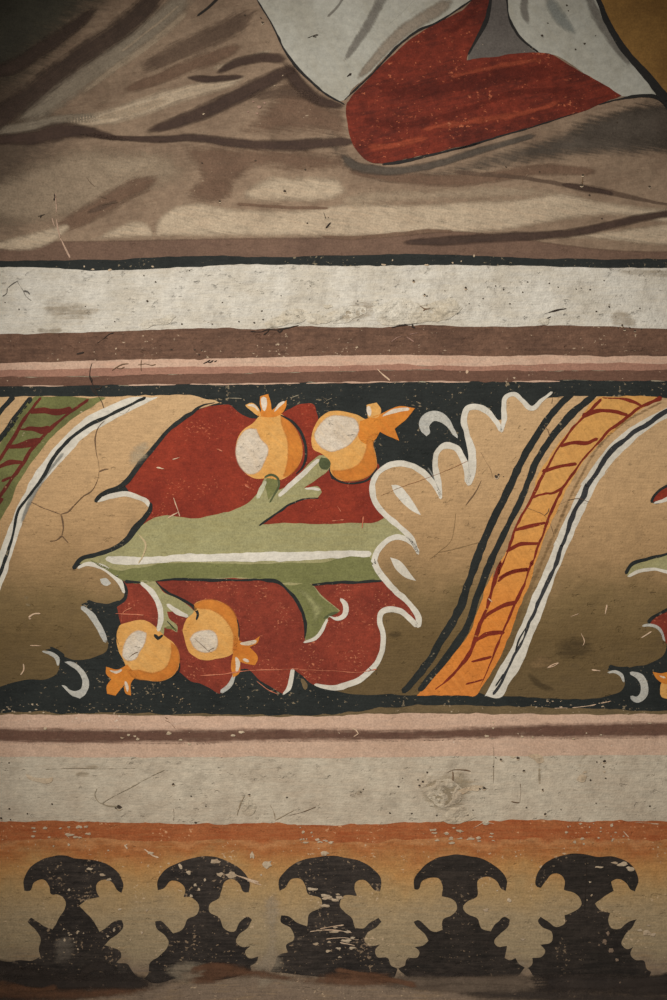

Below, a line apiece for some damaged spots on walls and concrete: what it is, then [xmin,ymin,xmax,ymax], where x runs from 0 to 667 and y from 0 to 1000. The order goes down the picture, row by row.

crack [31,333,156,543]
peeling [308,888,344,907]
peeling [313,926,356,958]